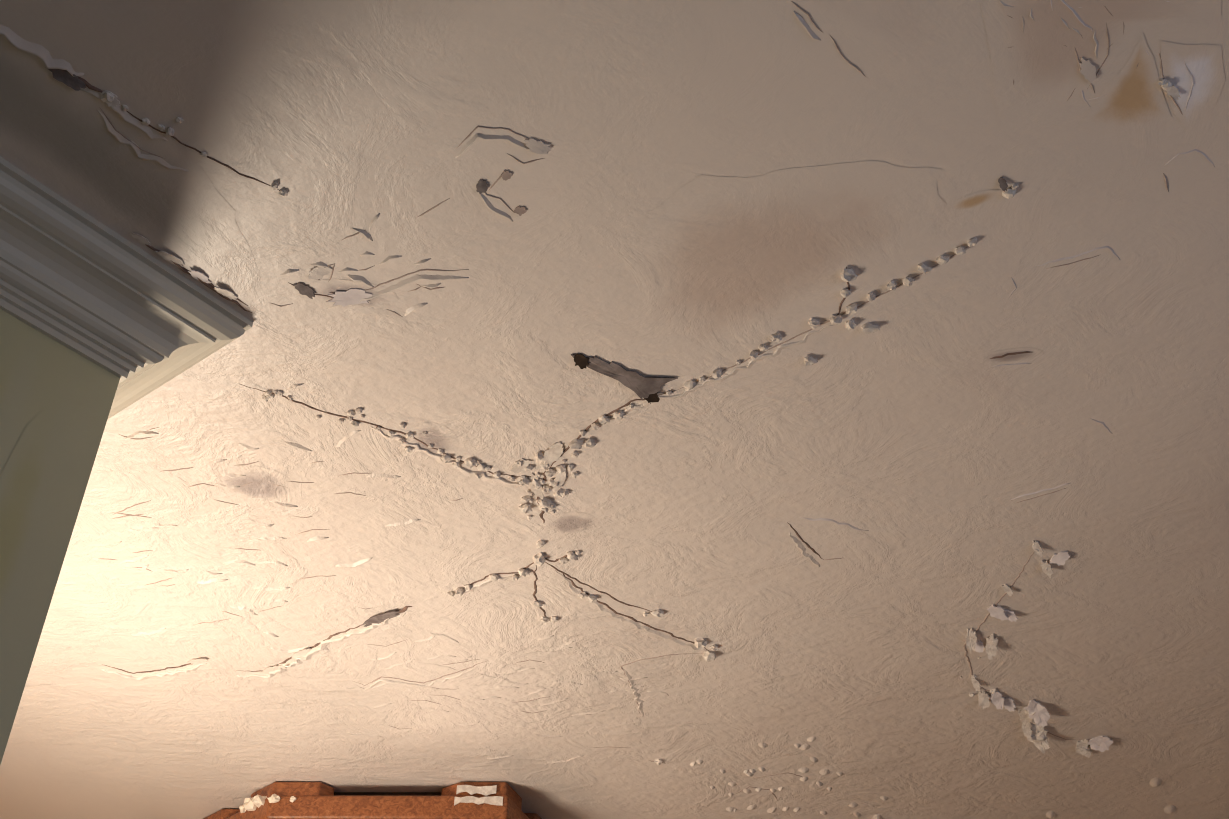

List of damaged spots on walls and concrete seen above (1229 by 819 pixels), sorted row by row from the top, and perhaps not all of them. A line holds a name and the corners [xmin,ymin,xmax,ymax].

crack [0,25,288,196]
peeling [1136,41,1225,130]
water stain [0,23,261,304]
peeling [455,126,551,222]
crack [131,233,252,313]
peeling [271,213,469,317]
crack [236,238,977,717]
crack [101,658,208,681]